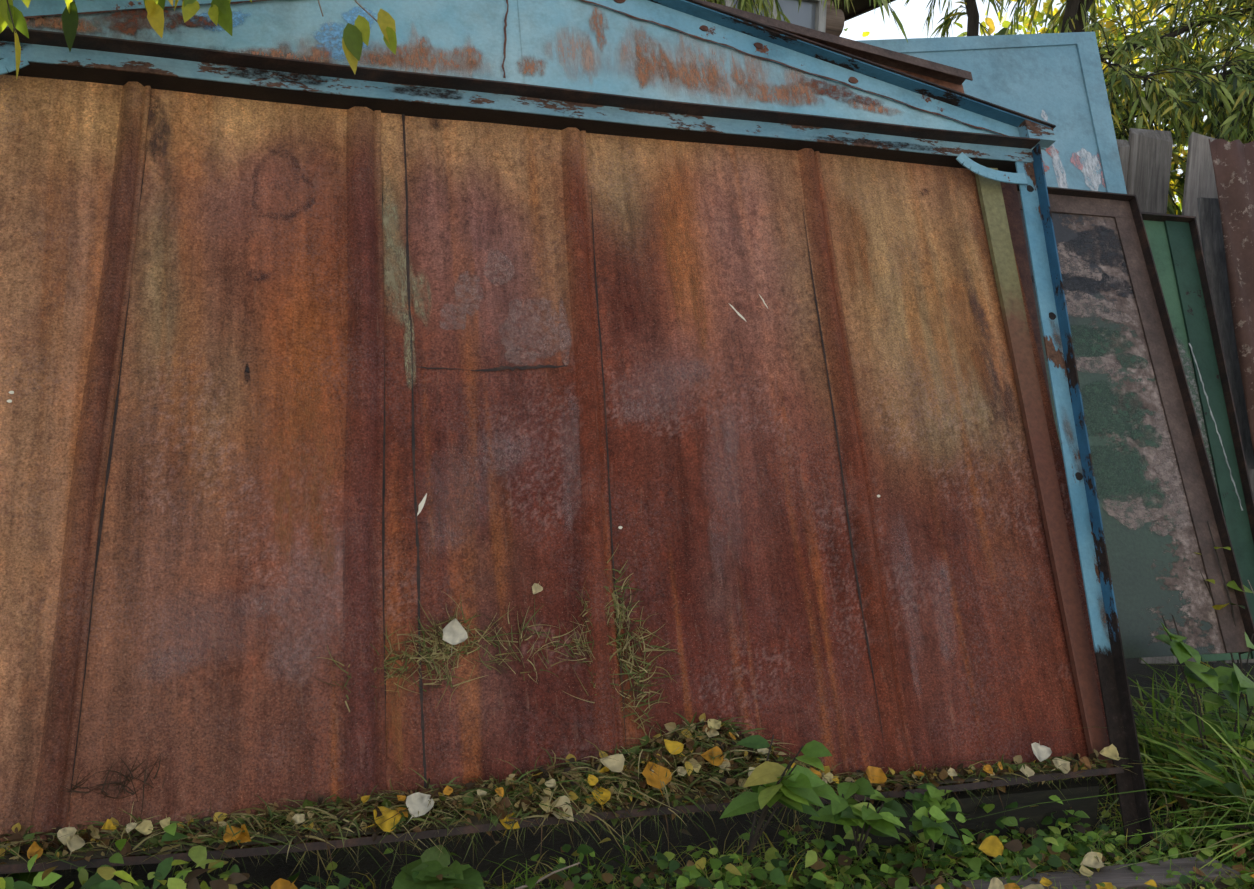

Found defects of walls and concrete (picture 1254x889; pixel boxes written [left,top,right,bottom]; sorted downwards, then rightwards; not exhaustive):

corrosion [590,8,606,48]
corrosion [364,37,482,68]
corrosion [519,59,543,75]
corrosion [636,34,896,115]
peeling [1075,353,1148,377]
peeling [1175,335,1243,511]
peeling [1103,406,1192,536]